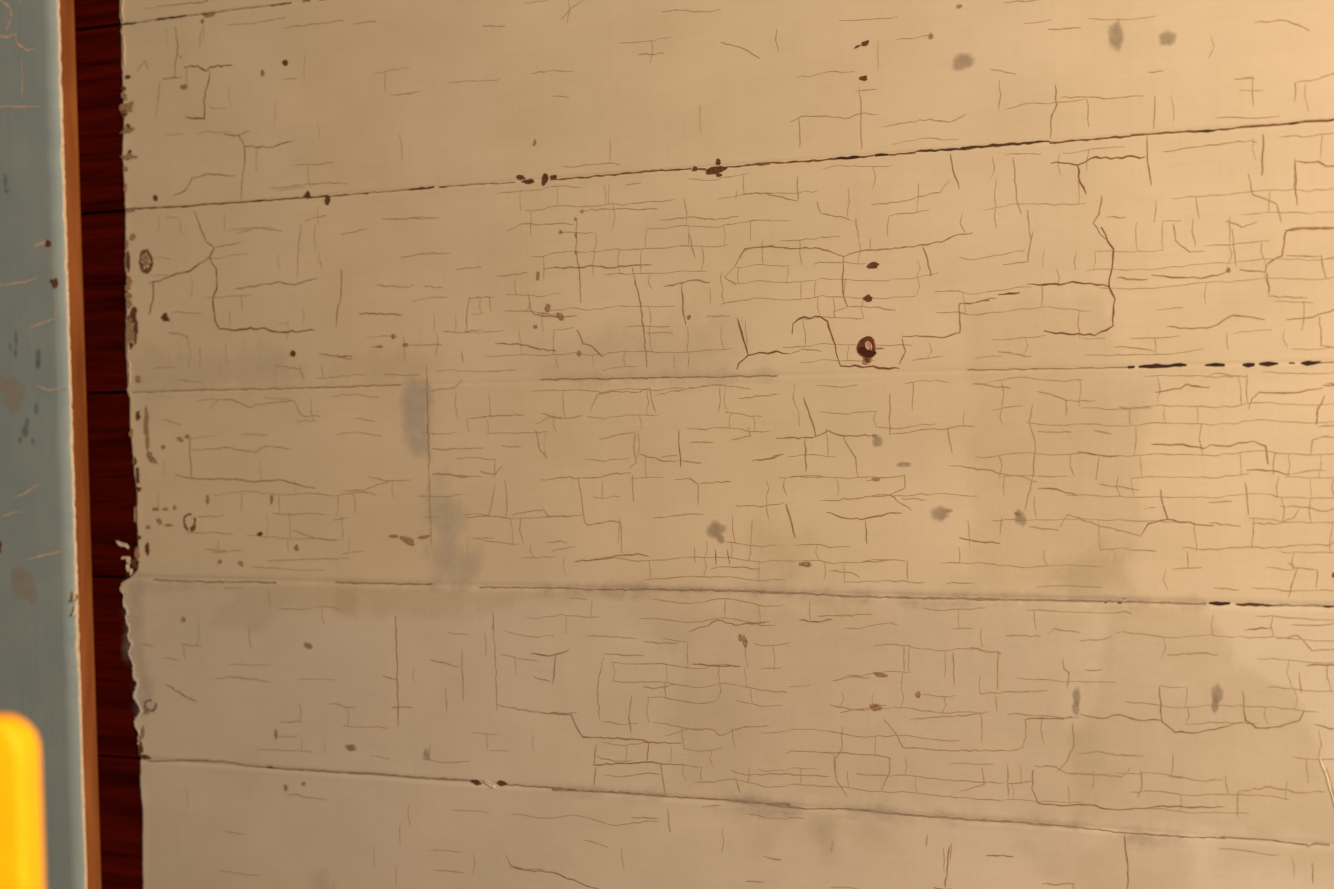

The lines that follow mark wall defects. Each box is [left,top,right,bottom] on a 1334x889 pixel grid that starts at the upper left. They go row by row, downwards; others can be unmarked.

crack [138,0,1334,666]
rust [859,347,876,365]
peeling [116,457,151,760]
crack [384,616,412,727]
crack [493,614,769,832]
crack [702,628,1334,889]
crack [506,855,598,889]